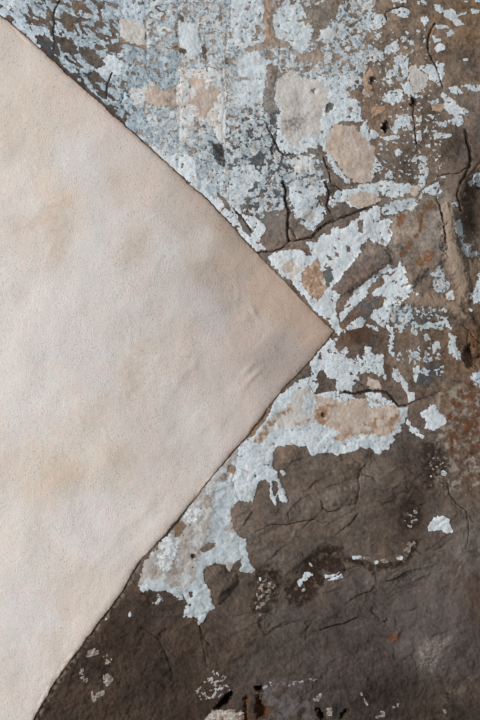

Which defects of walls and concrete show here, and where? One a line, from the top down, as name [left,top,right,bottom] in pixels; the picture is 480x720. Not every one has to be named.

peeling [416,4,480,53]
crack [427,23,447,88]
crack [267,126,291,159]
peeling [0,0,469,360]
crack [258,157,372,254]
crack [436,131,480,251]
peeling [406,334,445,382]
crack [344,380,438,406]
peeling [420,404,447,431]
peeling [138,338,425,625]
crack [255,500,357,535]
peeling [428,515,453,534]